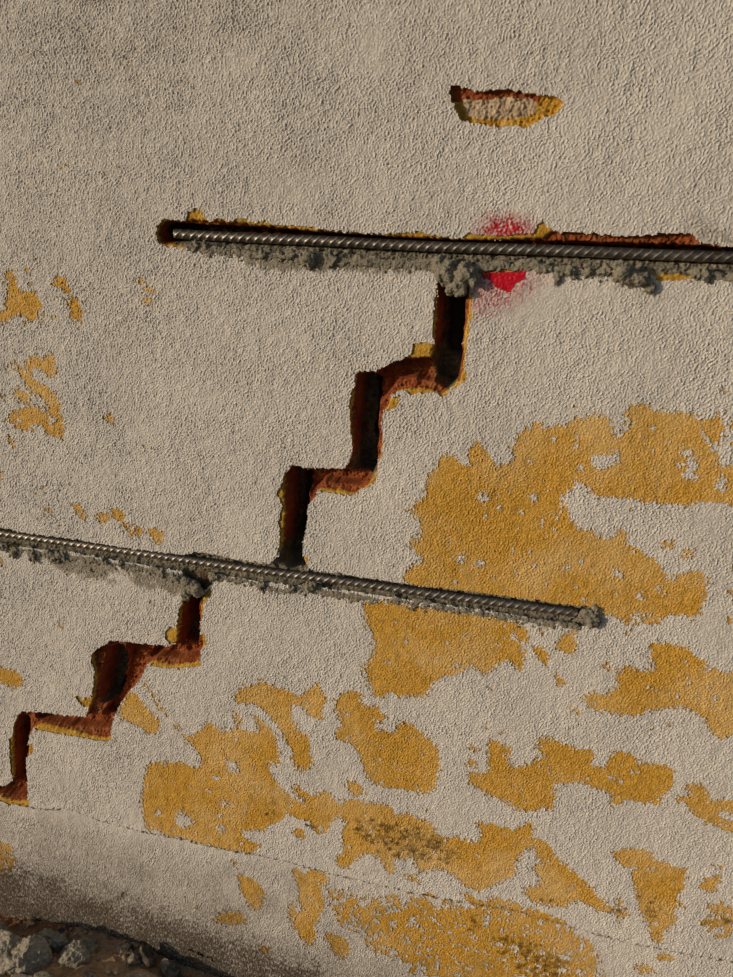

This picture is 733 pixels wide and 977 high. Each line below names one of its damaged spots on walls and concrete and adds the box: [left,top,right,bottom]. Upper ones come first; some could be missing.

spalling [448,84,564,129]
peeling [0,258,84,330]
spalling [155,208,733,281]
peeling [0,349,67,449]
crack [274,282,473,564]
crack [0,568,214,810]
peeling [0,402,733,977]
water stain [0,866,320,977]